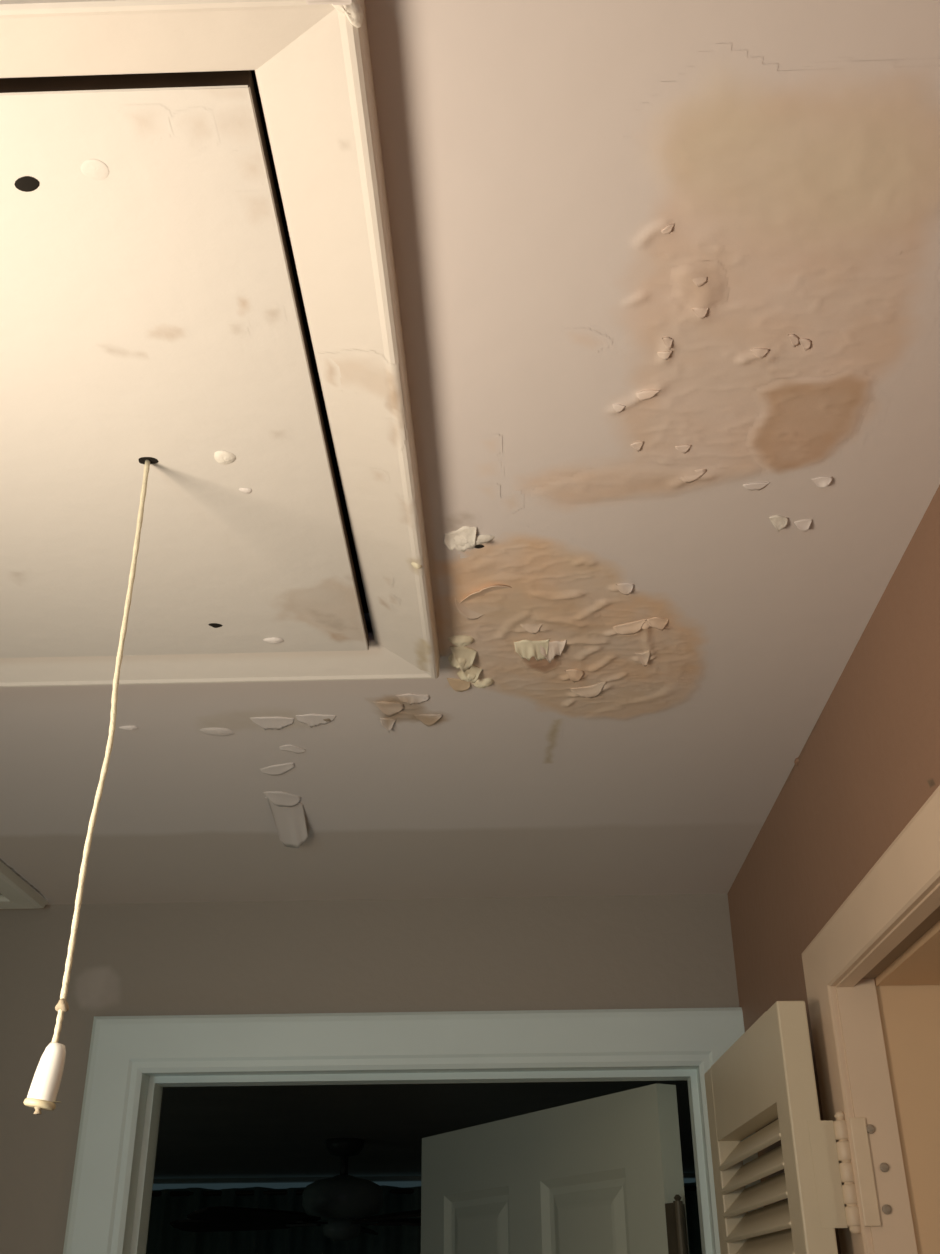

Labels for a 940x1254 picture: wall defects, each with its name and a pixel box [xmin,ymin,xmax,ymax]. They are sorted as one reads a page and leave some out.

damp [507,43,940,517]
peeling [769,515,812,532]
damp [403,526,715,765]
peeling [250,714,336,730]
peeling [263,791,308,848]